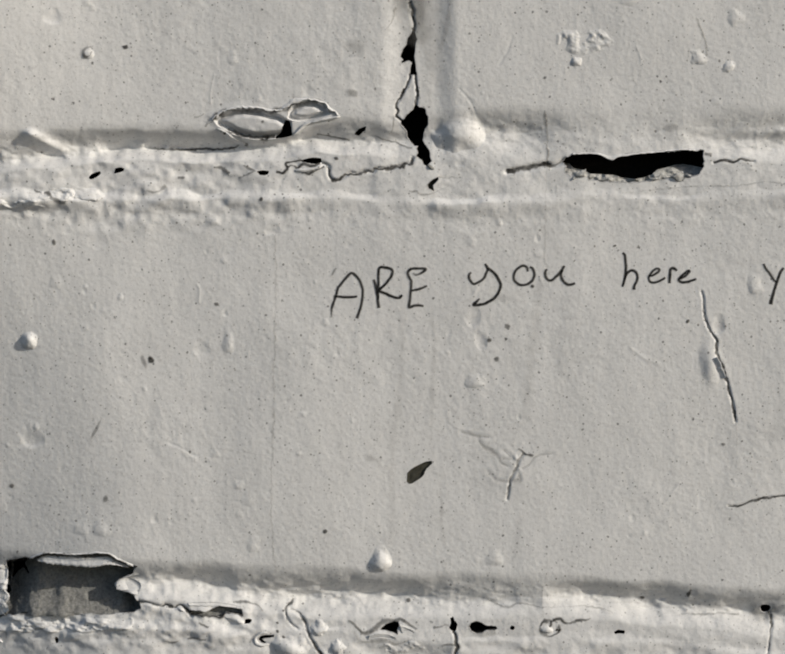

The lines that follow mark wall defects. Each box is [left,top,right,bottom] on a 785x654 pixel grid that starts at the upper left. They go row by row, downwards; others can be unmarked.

crack [322,1,434,182]
spalling [561,148,705,184]
crack [704,312,736,418]
crack [729,495,785,507]
peeling [1,552,142,617]
spalling [189,604,244,617]